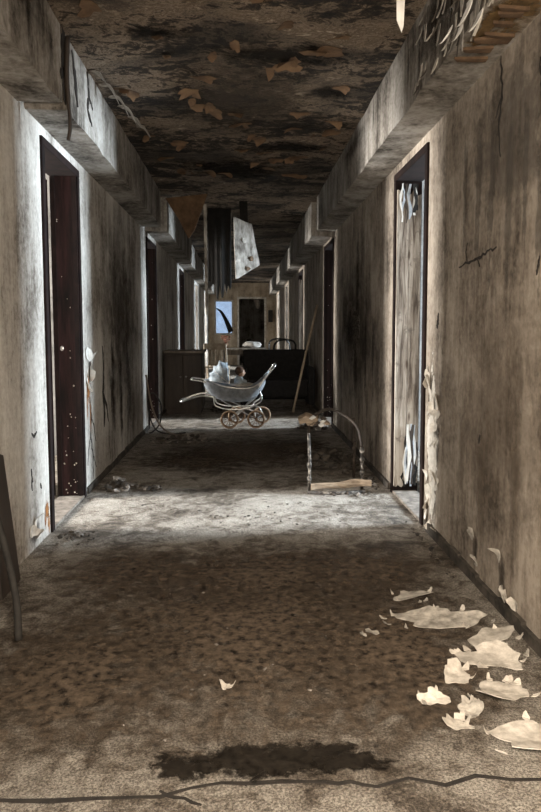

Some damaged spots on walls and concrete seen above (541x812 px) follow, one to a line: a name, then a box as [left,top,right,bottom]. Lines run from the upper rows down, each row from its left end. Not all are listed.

peeling [397,0,405,33]
leakage [129,26,181,39]
leakage [226,46,339,65]
leakage [311,87,345,99]
peeling [88,70,155,143]
leakage [271,142,318,152]
leakage [183,158,278,177]
leakage [107,251,134,432]